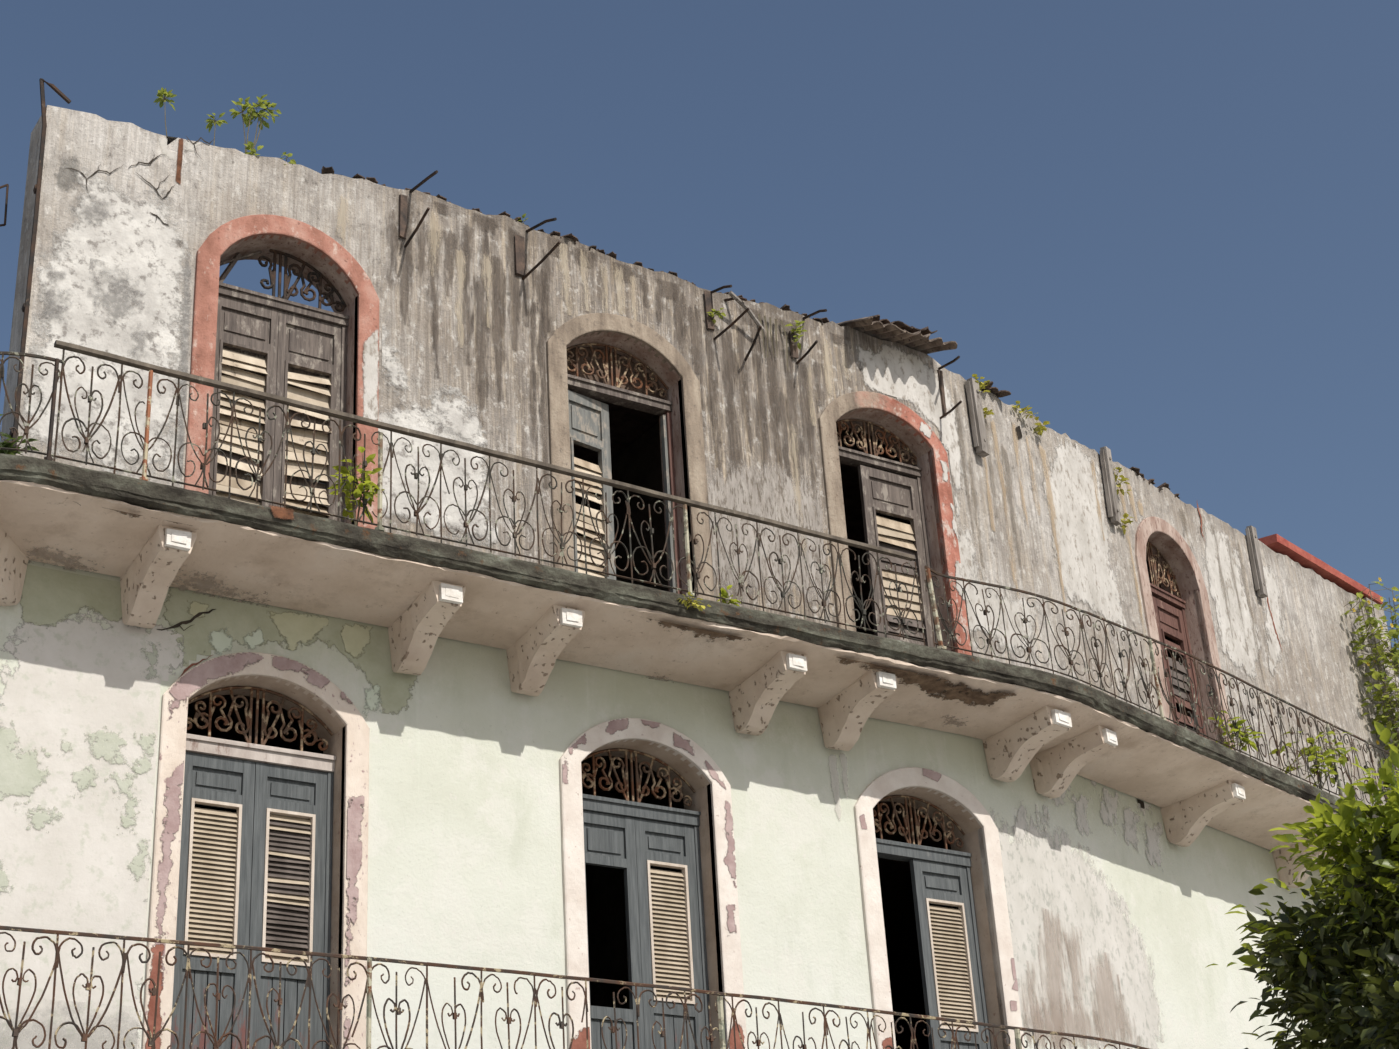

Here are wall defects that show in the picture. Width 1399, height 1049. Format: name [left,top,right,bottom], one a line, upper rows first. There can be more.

leakage [82,194,108,223]
crack [69,135,214,226]
leakage [42,271,68,318]
leakage [90,259,138,321]
leakage [387,201,594,489]
leakage [615,262,831,602]
peeling [856,344,1043,653]
crack [157,609,216,631]
crack [180,655,212,677]
spalling [837,657,1016,707]
peeling [0,565,418,1049]